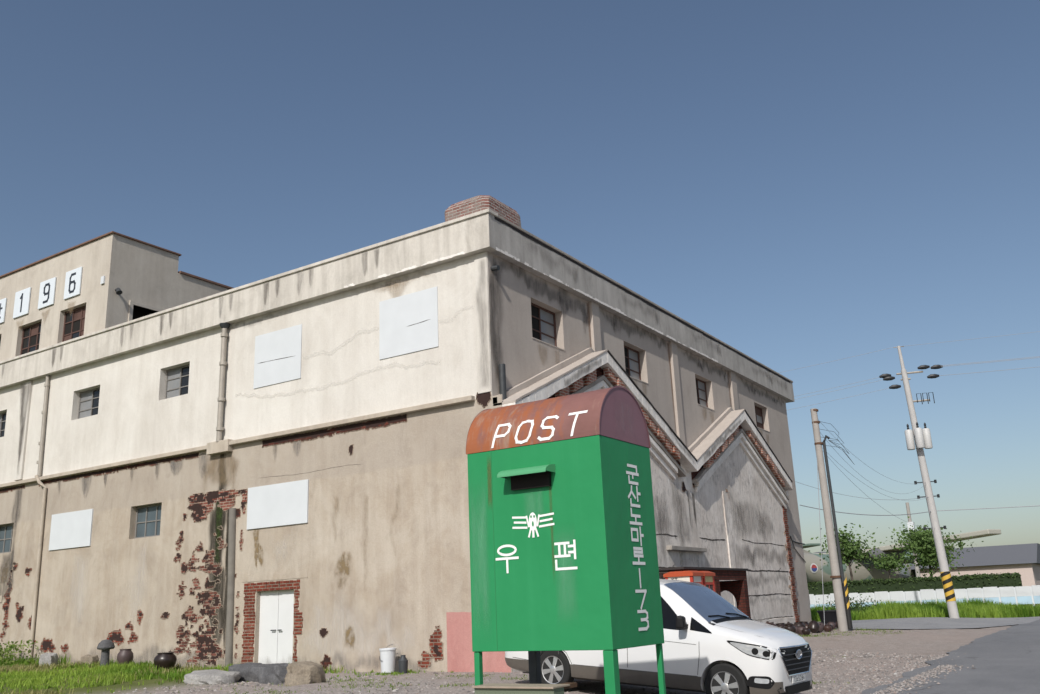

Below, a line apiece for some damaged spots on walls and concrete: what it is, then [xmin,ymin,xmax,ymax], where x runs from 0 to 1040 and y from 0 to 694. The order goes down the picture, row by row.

spalling [0,562,69,654]
spalling [106,609,144,646]
spalling [160,488,263,667]